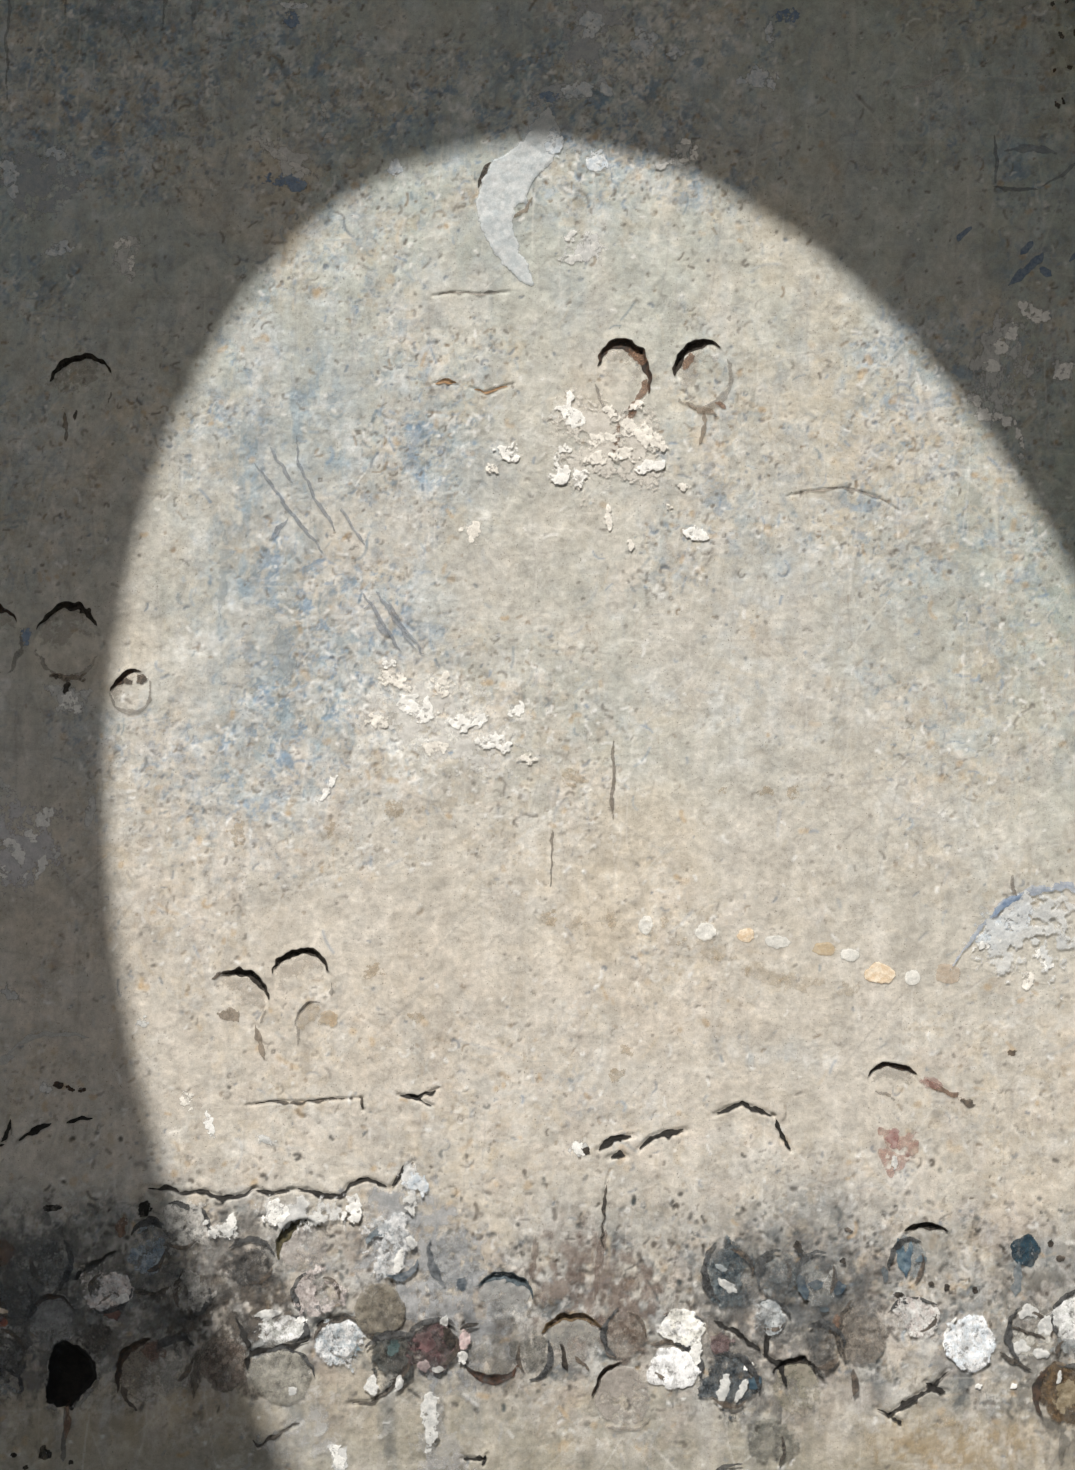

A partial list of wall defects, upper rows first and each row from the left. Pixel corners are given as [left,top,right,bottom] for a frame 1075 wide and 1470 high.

peeling [476,0,685,286]
peeling [1021,948,1054,991]
crack [400,1090,436,1106]
crack [717,1101,791,1150]
crack [148,1162,413,1202]
crack [599,1129,683,1247]
water stain [0,1215,320,1399]
water stain [355,1187,515,1392]
water stain [530,1237,658,1360]
spalling [43,1340,101,1439]
water stain [1052,1378,1075,1414]
spalling [10,1445,73,1470]